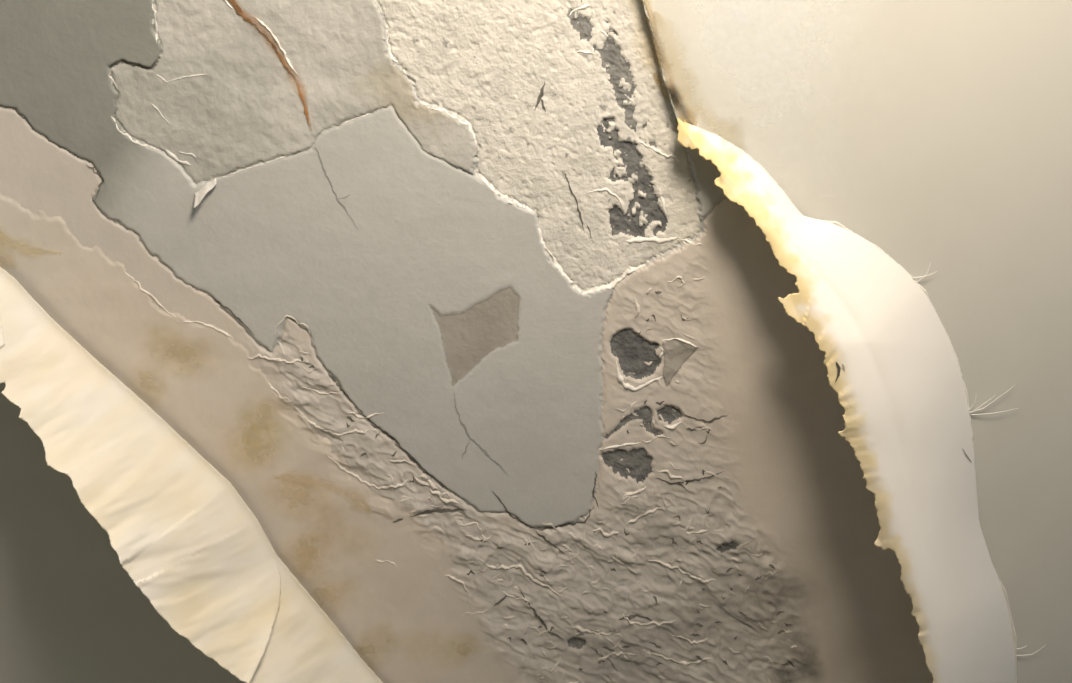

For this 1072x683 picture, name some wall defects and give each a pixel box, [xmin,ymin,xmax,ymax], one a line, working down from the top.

peeling [0,267,383,683]
corrosion [225,0,309,124]
peeling [0,0,641,529]
damp [644,0,696,126]
peeling [374,0,1027,683]